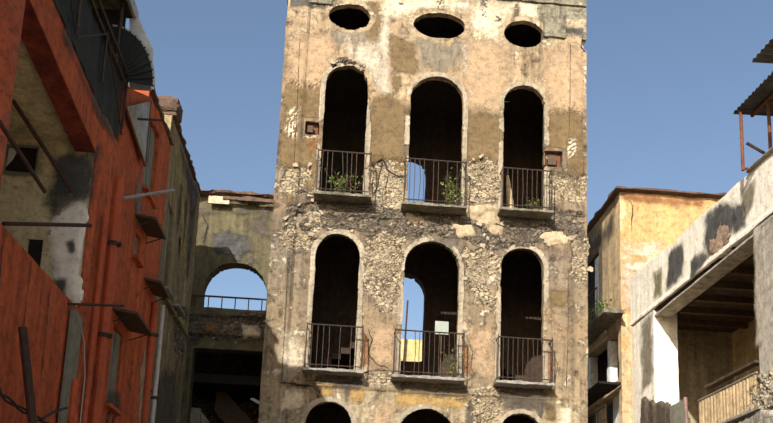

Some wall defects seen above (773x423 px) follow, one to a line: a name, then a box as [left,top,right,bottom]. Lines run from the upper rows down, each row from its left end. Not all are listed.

damp [47,146,101,212]
flaking render [278,154,593,387]
flaking render [558,408,572,423]